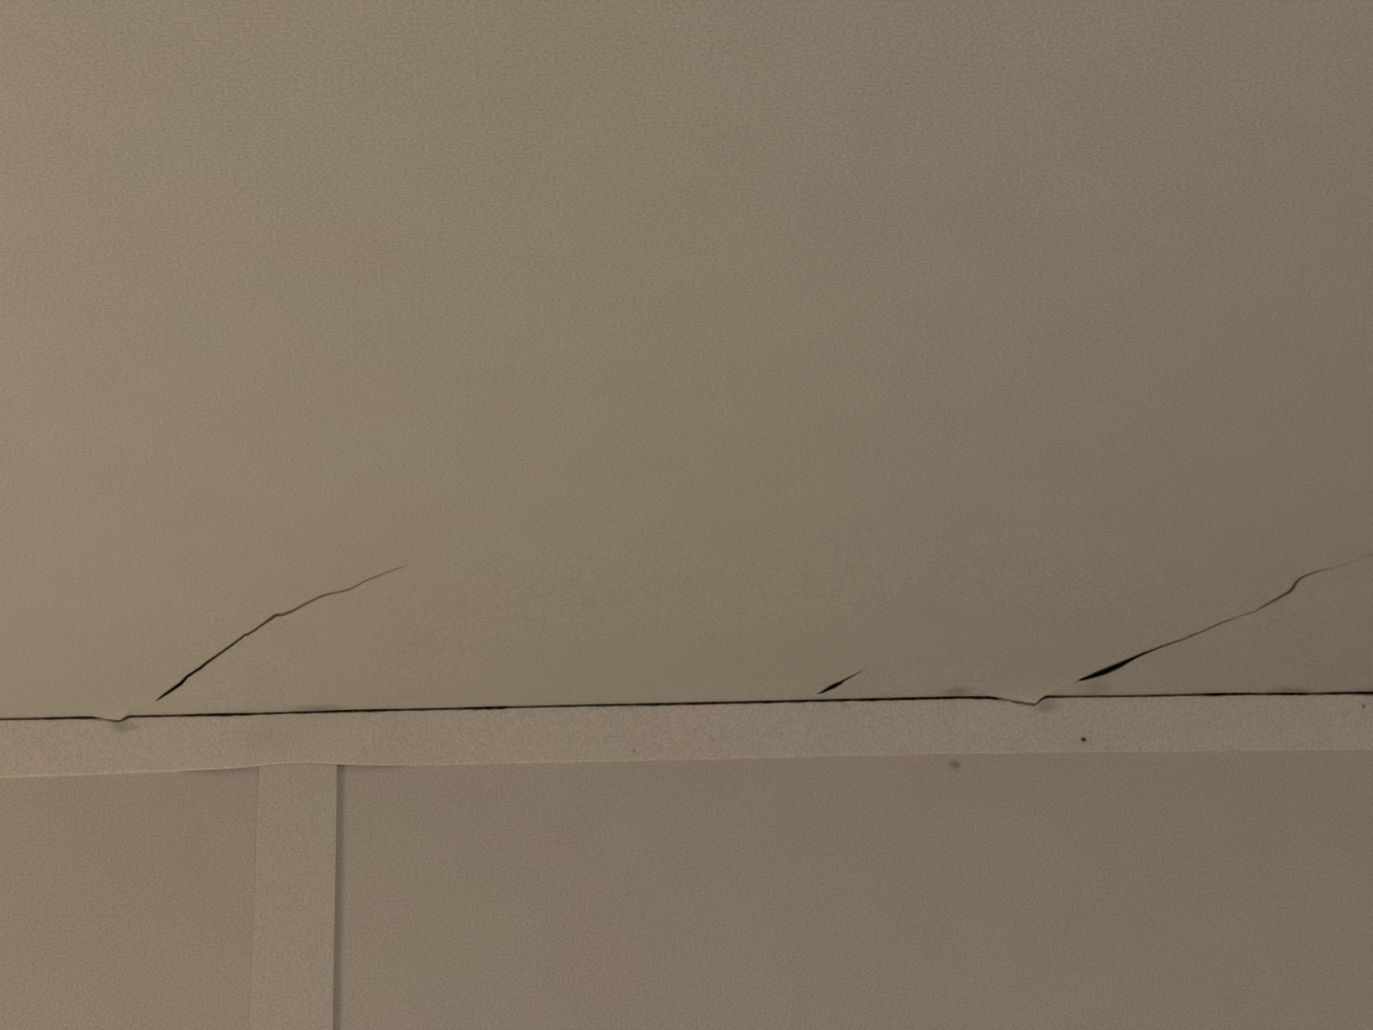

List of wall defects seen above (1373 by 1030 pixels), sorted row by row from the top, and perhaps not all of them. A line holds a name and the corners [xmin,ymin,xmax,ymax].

crack [29,610,1373,722]